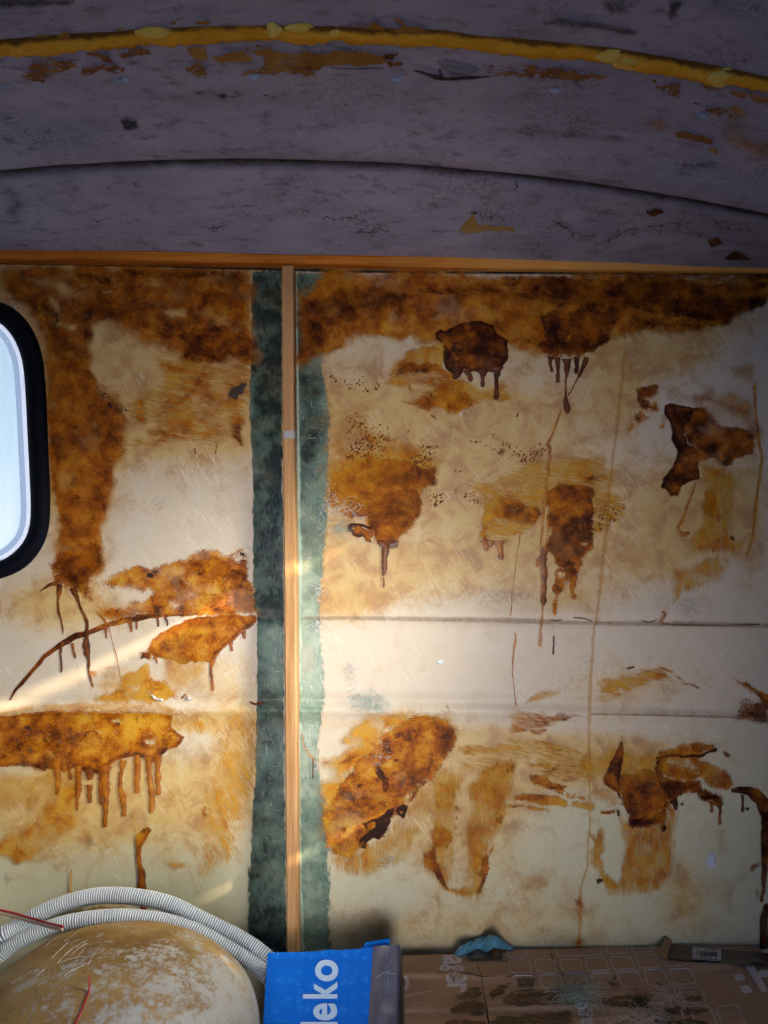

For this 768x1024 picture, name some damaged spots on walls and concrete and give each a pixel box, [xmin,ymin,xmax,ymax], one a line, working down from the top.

peeling [86,47,151,64]
peeling [185,43,403,78]
peeling [362,18,429,35]
peeling [459,211,515,234]
corrosion [296,270,768,418]
corrosion [0,266,260,828]
corrosion [328,435,438,588]
corrosion [475,458,625,615]
corrosion [628,384,757,497]
corrosion [322,713,768,949]